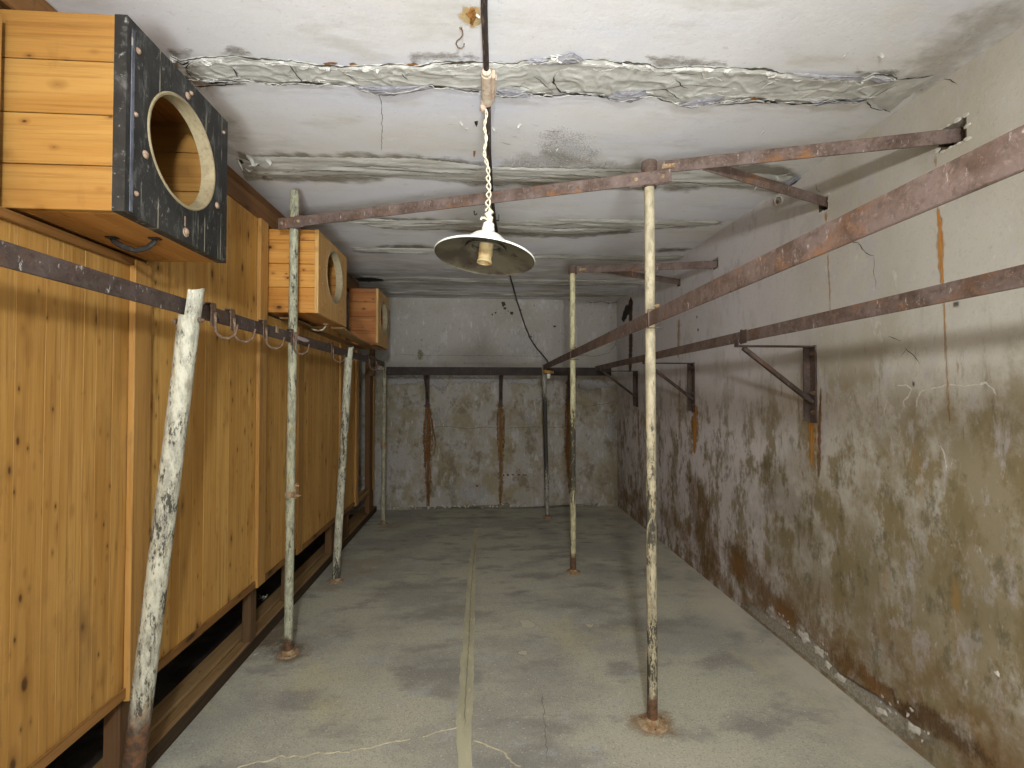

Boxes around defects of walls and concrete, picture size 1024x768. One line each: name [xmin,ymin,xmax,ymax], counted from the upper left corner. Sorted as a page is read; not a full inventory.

peeling [347,66,433,96]
peeling [525,53,583,65]
peeling [600,90,653,103]
rust [423,405,436,506]
rust [497,404,505,504]
rust [679,391,698,453]
rust [808,388,822,476]
crack [883,382,997,417]
water stain [686,472,807,632]
crack [237,727,521,768]
flaking render [742,604,945,746]
water stain [824,649,992,765]